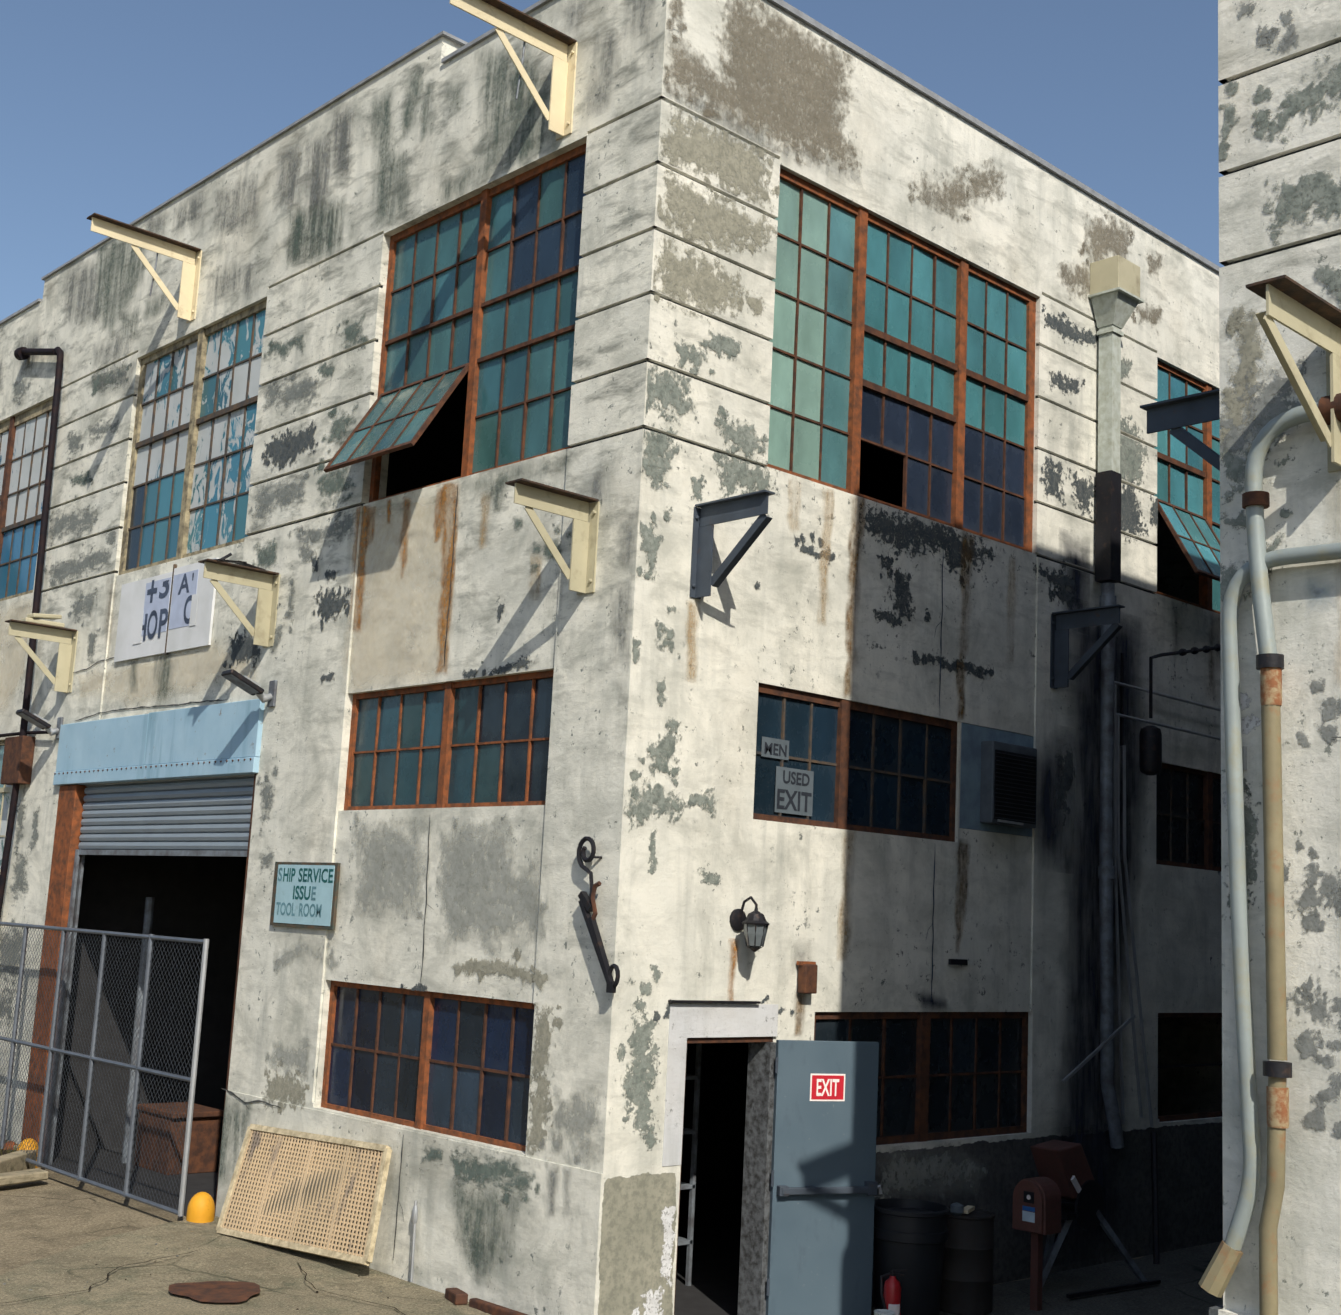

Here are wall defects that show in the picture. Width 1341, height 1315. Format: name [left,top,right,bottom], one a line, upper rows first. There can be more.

damp [68,241,142,356]
damp [288,115,348,260]
damp [374,74,430,218]
peeling [642,0,861,501]
peeling [250,363,358,632]
rust [355,506,374,629]
rust [387,500,409,567]
rust [435,484,457,671]
rust [845,499,864,694]
peeling [623,680,717,874]
damp [1038,625,1140,1251]
peeling [617,964,672,1151]